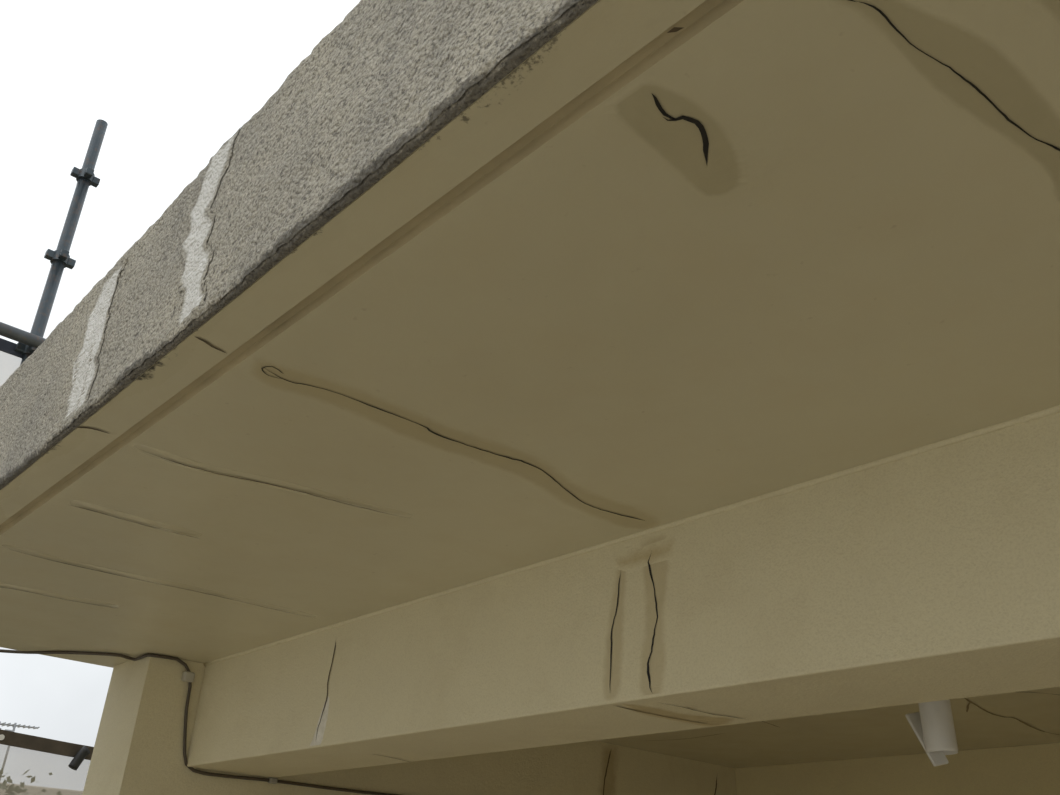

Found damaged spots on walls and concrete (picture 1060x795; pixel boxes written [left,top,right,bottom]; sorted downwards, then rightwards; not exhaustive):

crack [598,69,756,204]
crack [796,0,1060,213]
leakage [0,0,629,523]
crack [196,337,778,727]
crack [308,642,336,746]